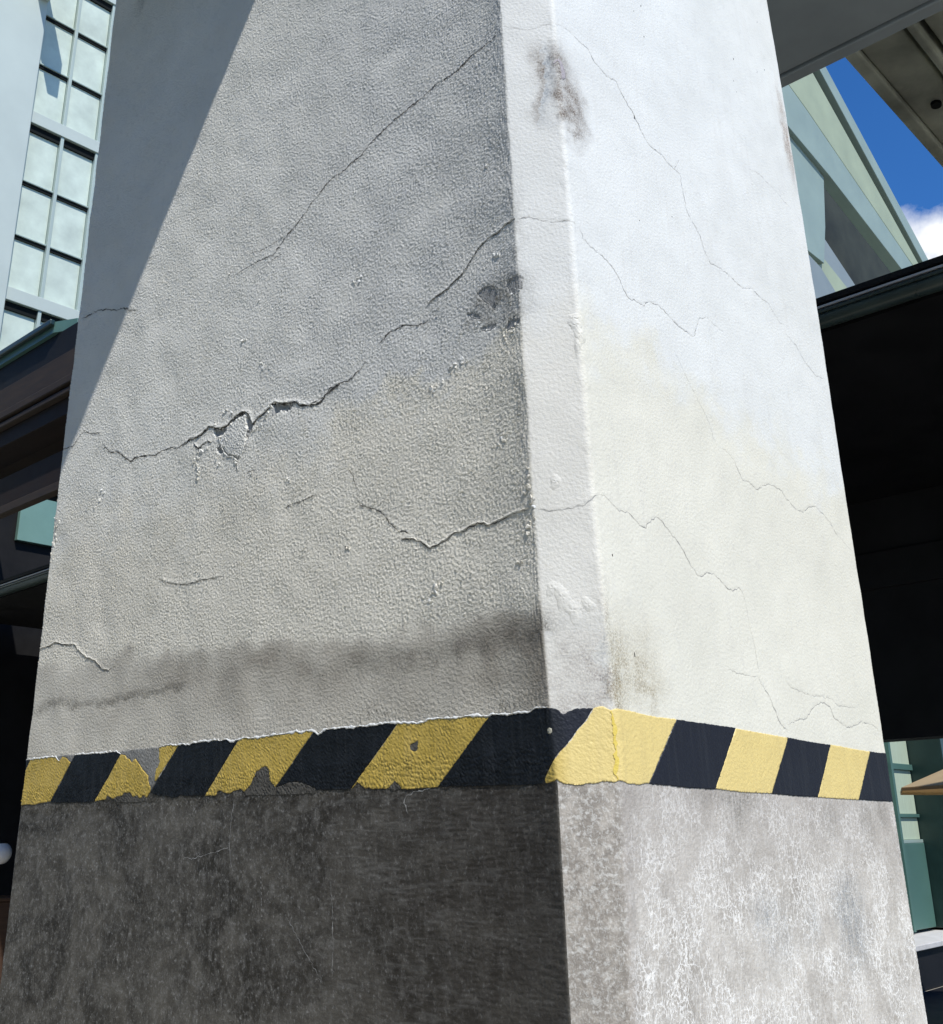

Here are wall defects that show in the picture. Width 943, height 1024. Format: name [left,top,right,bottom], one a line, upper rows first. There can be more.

water stain [554,53,581,135]
crack [233,24,819,377]
crack [64,217,716,481]
peeling [214,415,253,457]
crack [349,470,743,593]
crack [40,641,115,670]
peeling [26,707,547,803]